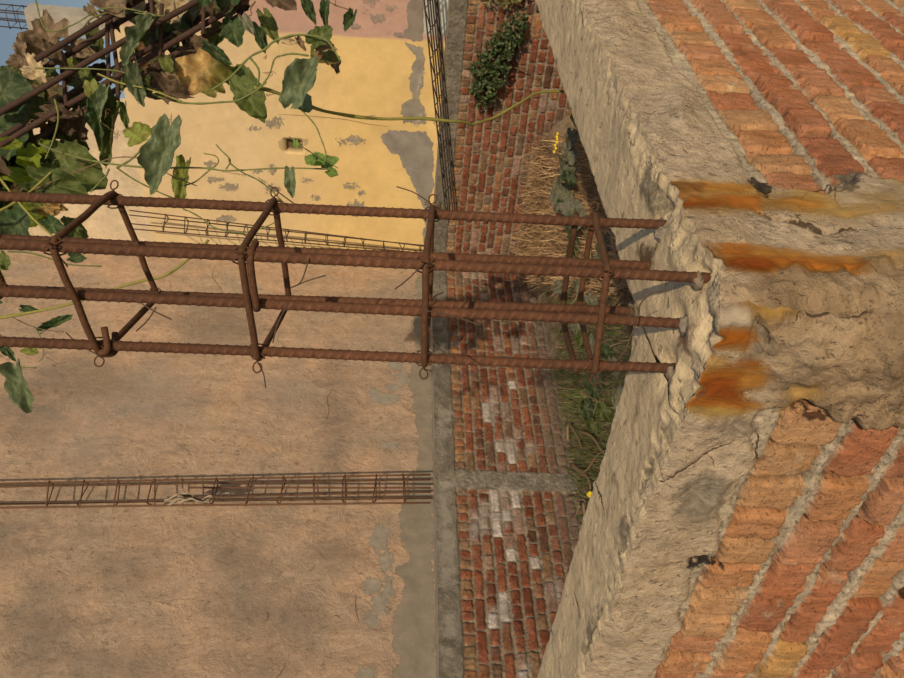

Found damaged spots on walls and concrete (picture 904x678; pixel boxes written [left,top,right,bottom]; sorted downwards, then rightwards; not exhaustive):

peeling [246,116,284,131]
peeling [335,135,366,147]
peeling [362,0,435,242]
peeling [204,160,238,191]
peeling [251,164,282,194]
peeling [343,182,366,217]
corrosion [670,181,904,218]
corrosion [709,243,897,275]
corrosion [685,325,769,416]
crack [653,428,759,490]
peeling [360,316,436,678]